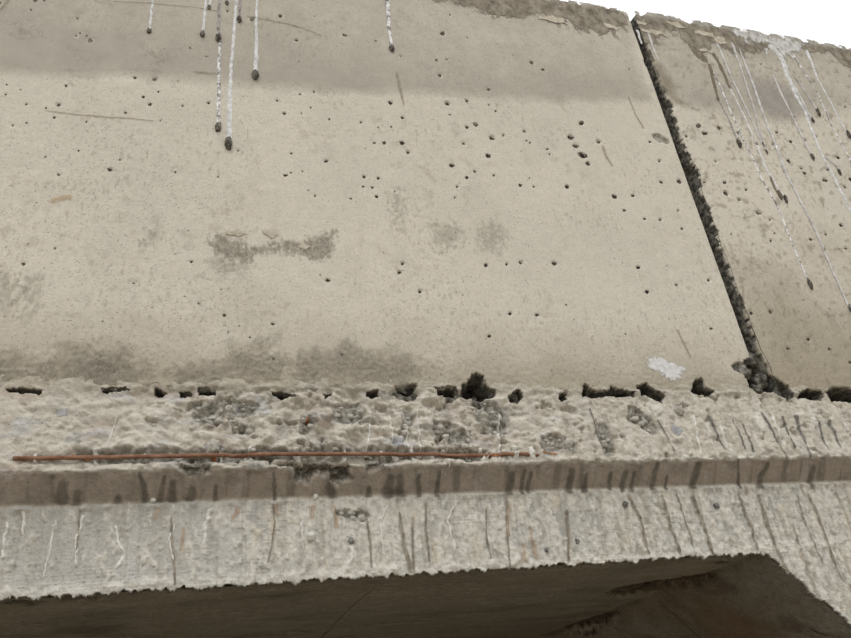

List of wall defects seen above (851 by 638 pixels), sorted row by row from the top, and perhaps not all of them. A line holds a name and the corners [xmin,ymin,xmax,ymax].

water stain [200,0,242,150]
crack [630,14,781,396]
water stain [688,28,851,312]
spalling [13,410,578,486]
spalling [391,384,417,402]
spalling [435,373,506,438]
spalling [582,384,662,433]
spalling [691,379,713,397]
water stain [690,415,714,555]
water stain [708,414,759,549]
spalling [732,357,851,403]
water stain [757,412,844,582]